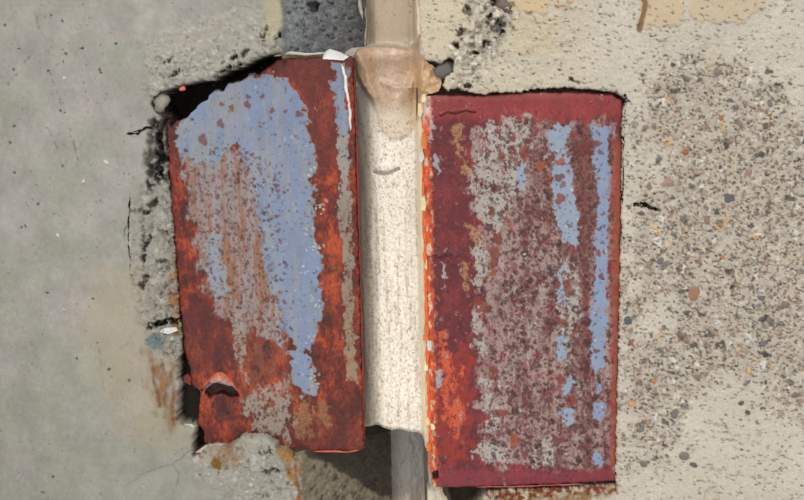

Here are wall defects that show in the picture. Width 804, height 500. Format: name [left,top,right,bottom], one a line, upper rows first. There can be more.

spalling [433,0,591,95]
peeling [636,0,767,31]
spalling [127,1,352,361]
corrosion [353,63,365,441]
spalling [615,38,804,482]
corrosion [202,372,238,395]
corrosion [423,210,432,468]
spalling [186,432,316,500]
corrosion [480,483,618,500]